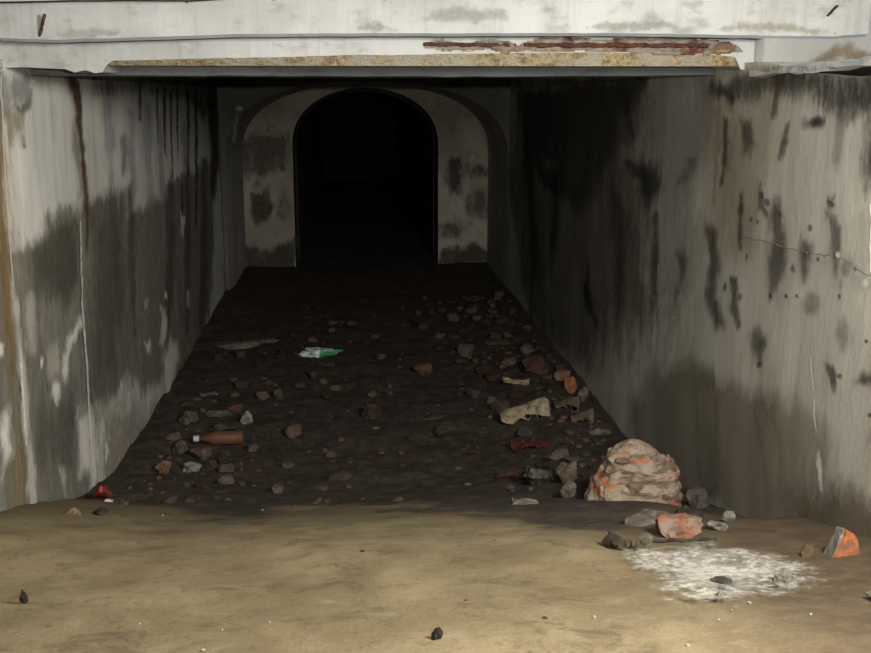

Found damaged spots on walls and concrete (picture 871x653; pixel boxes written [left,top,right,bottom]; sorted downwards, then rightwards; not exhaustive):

corrosion [69,77,89,245]
leakage [742,123,753,151]
leakage [779,126,788,156]
leakage [711,73,871,119]
leakage [0,77,219,511]
leakage [676,215,741,330]
leakage [738,195,752,258]
leakage [759,193,819,298]
crack [743,204,871,287]
leakage [827,201,840,268]
leakage [826,365,841,389]
leakage [634,321,826,518]